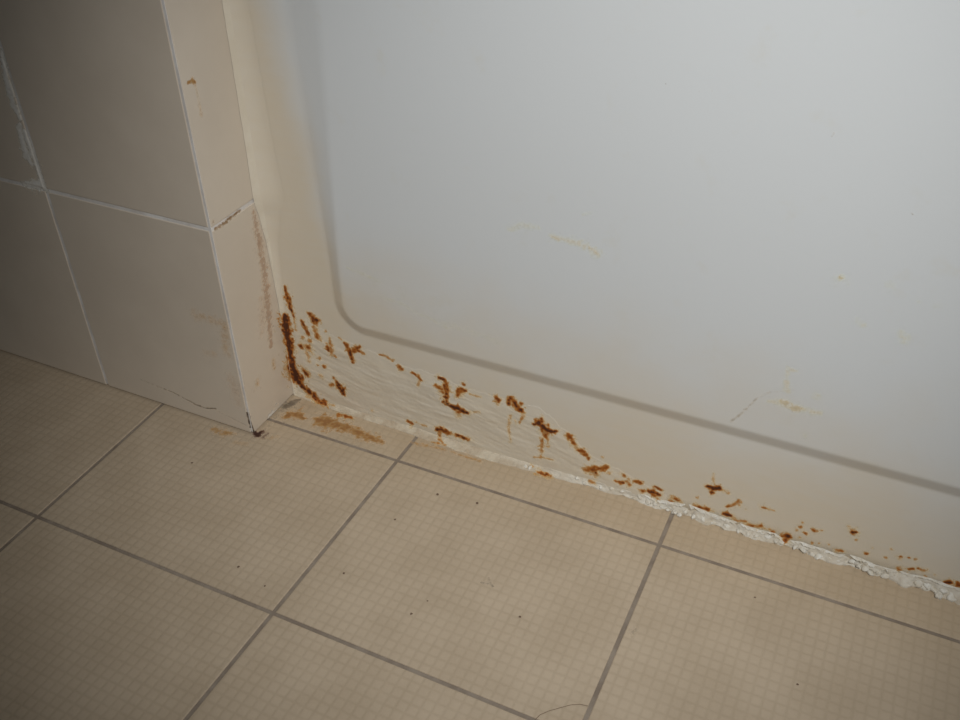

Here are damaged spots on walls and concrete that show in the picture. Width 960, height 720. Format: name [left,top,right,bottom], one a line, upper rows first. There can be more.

corrosion [277,285,384,444]
corrosion [379,354,479,416]
corrosion [406,419,481,462]
peeling [637,494,960,602]